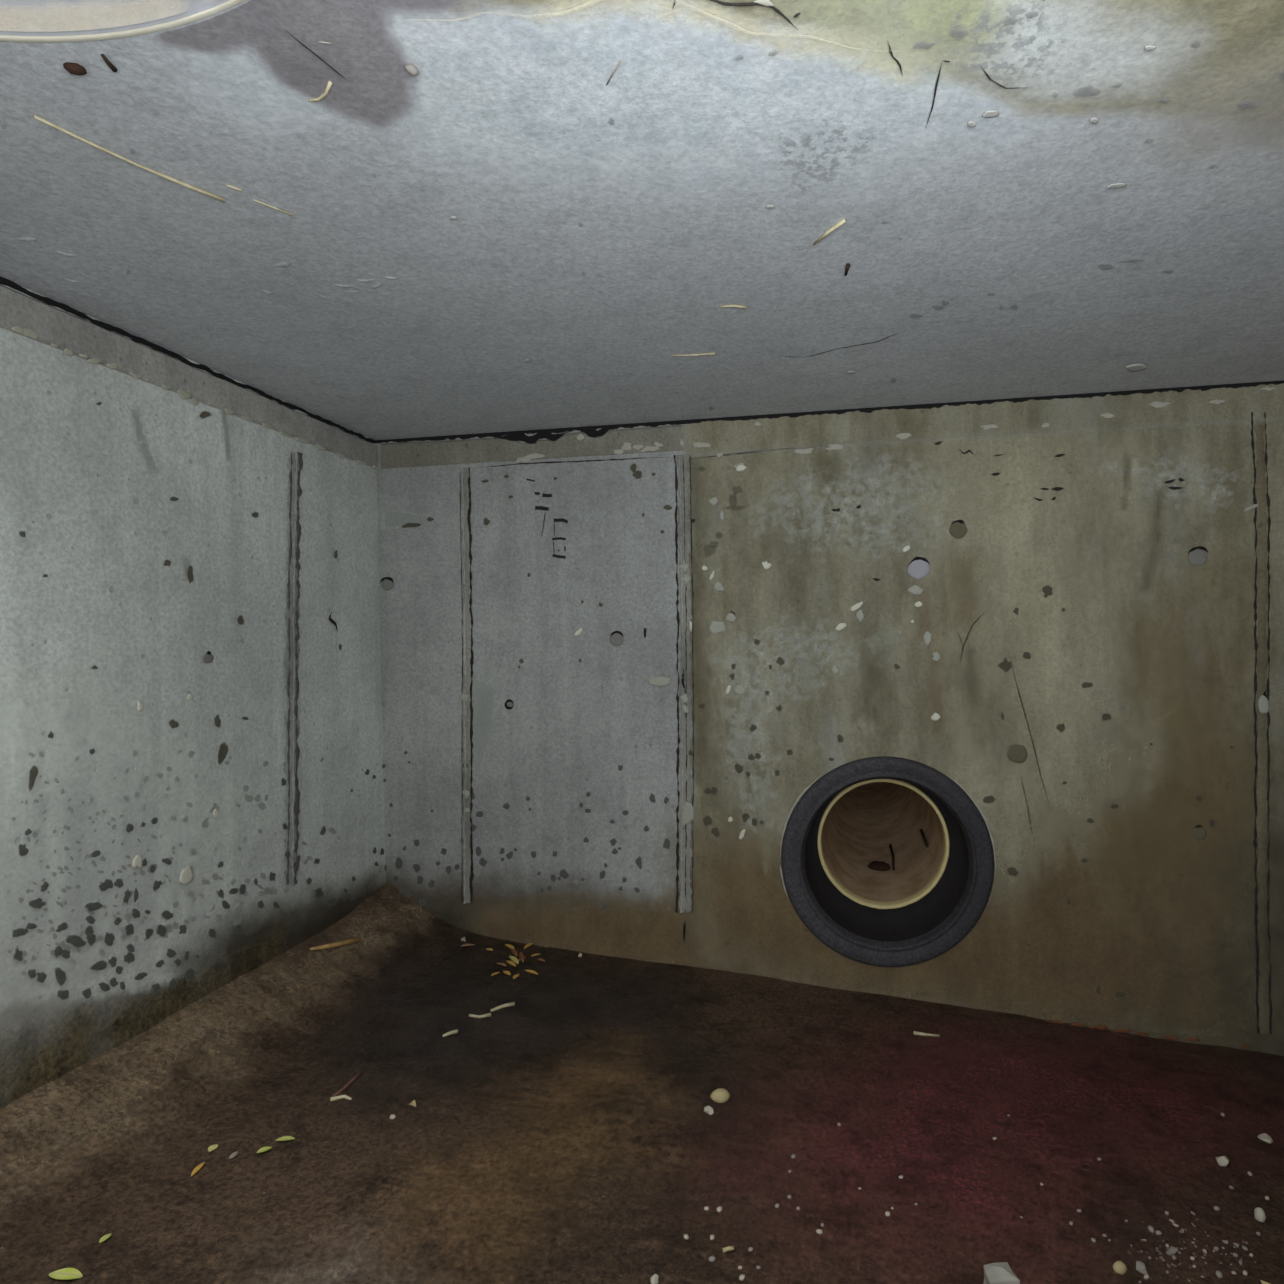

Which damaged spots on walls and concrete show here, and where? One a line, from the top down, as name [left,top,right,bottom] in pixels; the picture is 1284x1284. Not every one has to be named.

water stain [0,0,987,174]
water stain [760,436,1230,809]
water stain [0,731,649,1180]
water stain [619,839,670,893]
water stain [720,626,841,826]
water stain [967,764,1034,867]